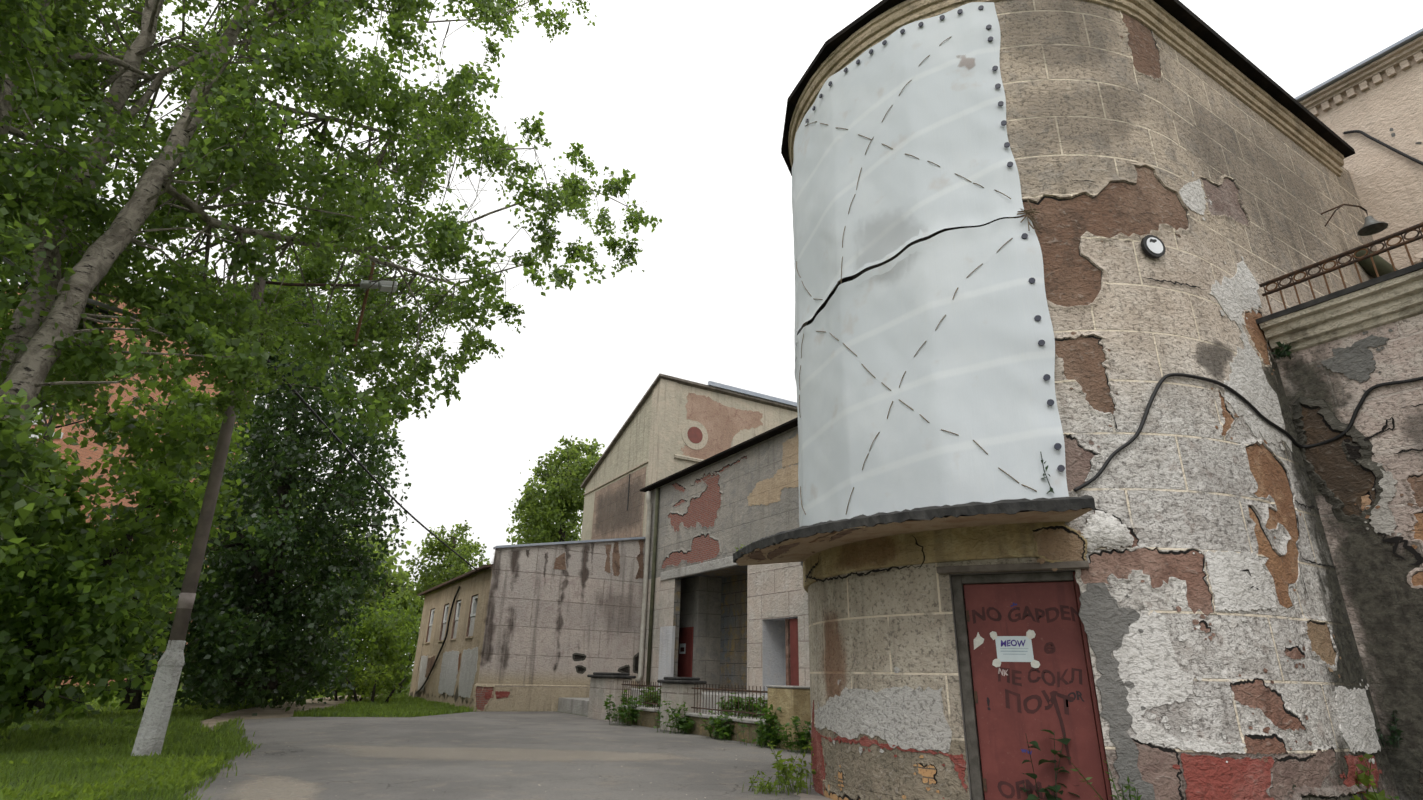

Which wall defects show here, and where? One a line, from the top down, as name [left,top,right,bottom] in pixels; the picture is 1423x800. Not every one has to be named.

spalling [1117,10,1163,83]
spalling [1008,161,1250,313]
damp [480,550,547,666]
damp [557,544,594,631]
spalling [603,539,645,580]
spalling [661,392,763,571]
spalling [1030,256,1423,800]
damp [1264,349,1423,800]
peeling [811,666,968,800]